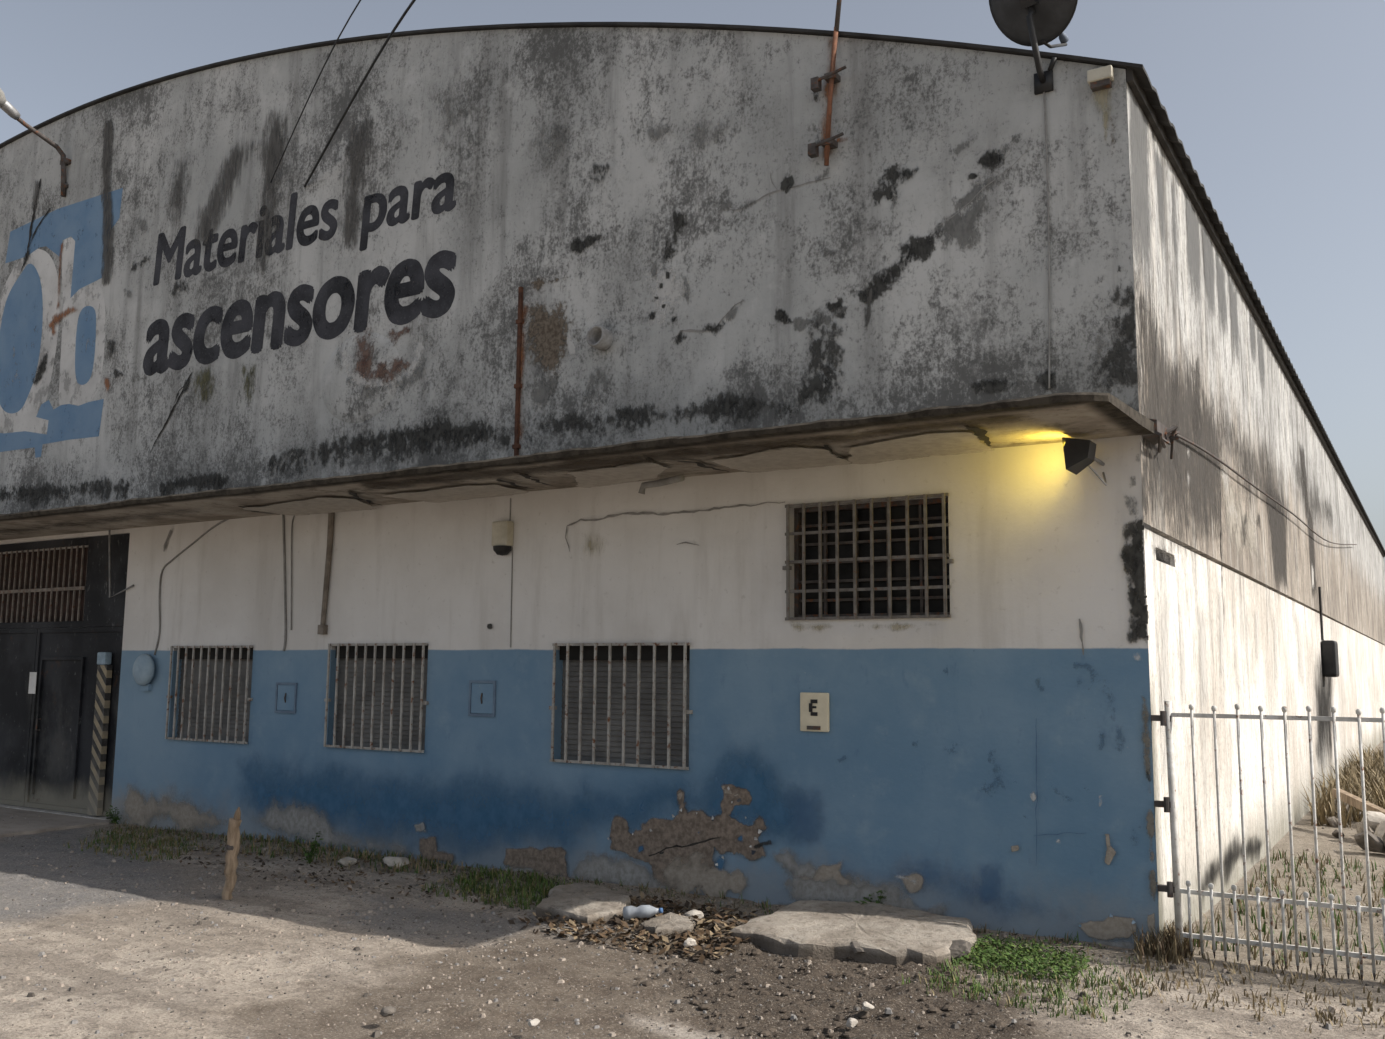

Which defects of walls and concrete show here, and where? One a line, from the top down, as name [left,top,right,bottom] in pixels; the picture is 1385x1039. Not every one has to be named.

damp [101,120,131,297]
damp [195,113,287,272]
damp [264,119,1020,490]
damp [33,353,47,384]
damp [0,477,132,508]
damp [159,472,228,496]
damp [1037,371,1056,390]
damp [1093,88,1333,777]
peeling [1142,697,1151,782]
peeling [503,784,817,897]
peeling [899,873,923,893]
peeling [1079,810,1157,949]